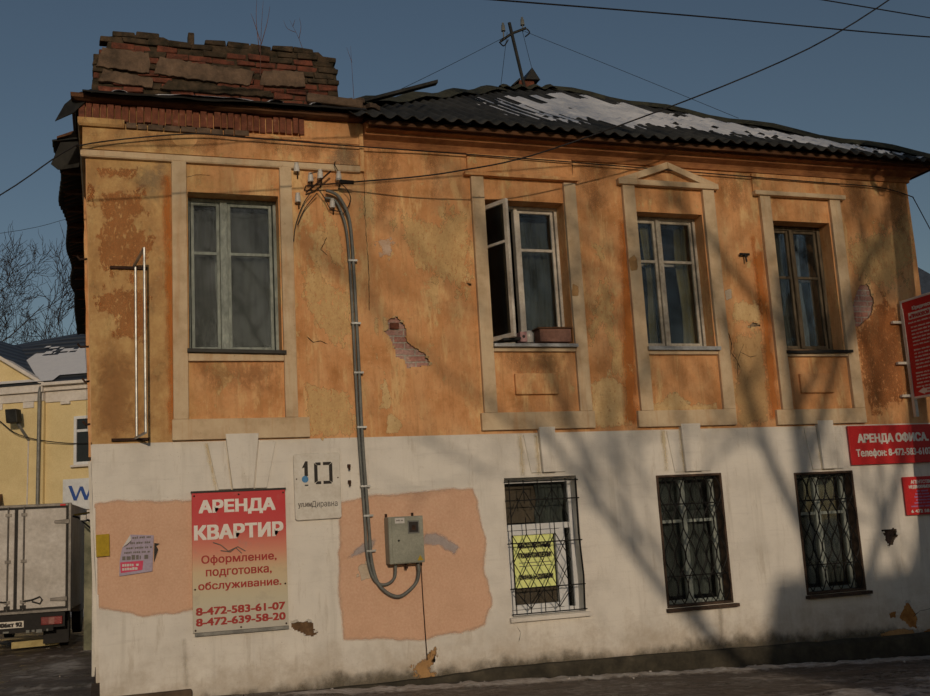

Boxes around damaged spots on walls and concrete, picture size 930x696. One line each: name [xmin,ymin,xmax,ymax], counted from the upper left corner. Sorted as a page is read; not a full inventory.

spalling [384,316,432,368]
peeling [852,282,911,415]
spalling [881,528,900,548]
peeling [290,619,318,637]
peeling [880,599,930,636]
peeling [411,647,438,679]